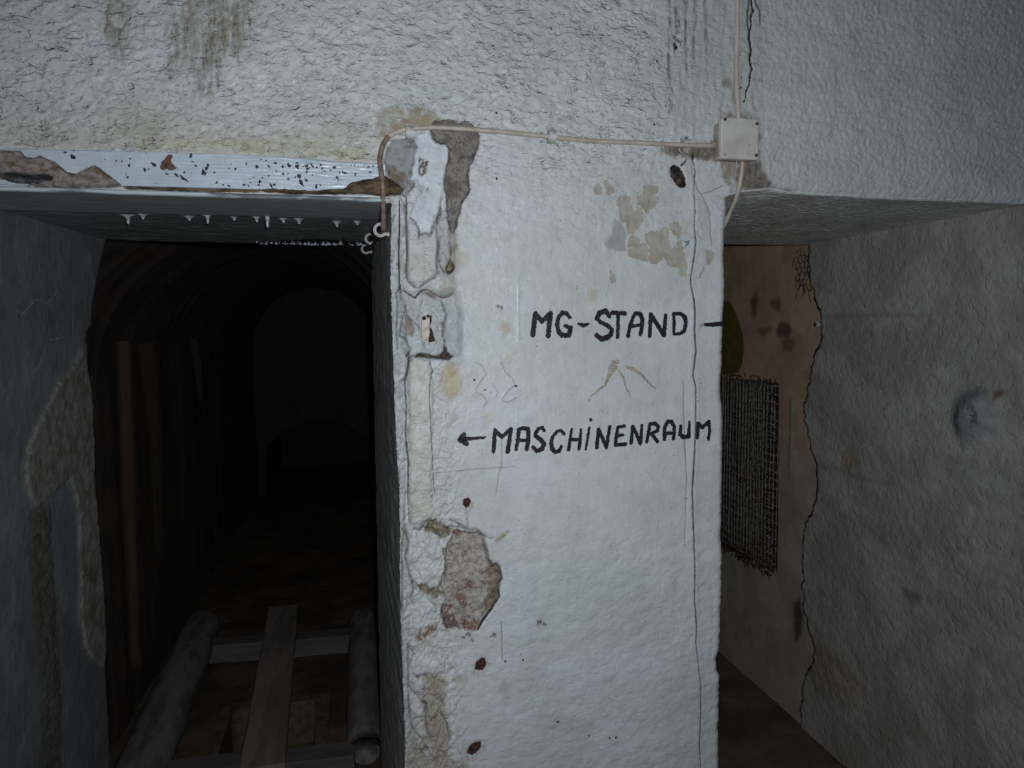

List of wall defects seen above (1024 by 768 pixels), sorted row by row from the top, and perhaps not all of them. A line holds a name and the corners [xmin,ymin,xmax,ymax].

crack [743,0,761,102]
spalling [0,150,131,188]
flaking render [143,139,417,197]
spalling [430,119,480,270]
peeling [593,179,715,278]
spalling [417,519,503,630]